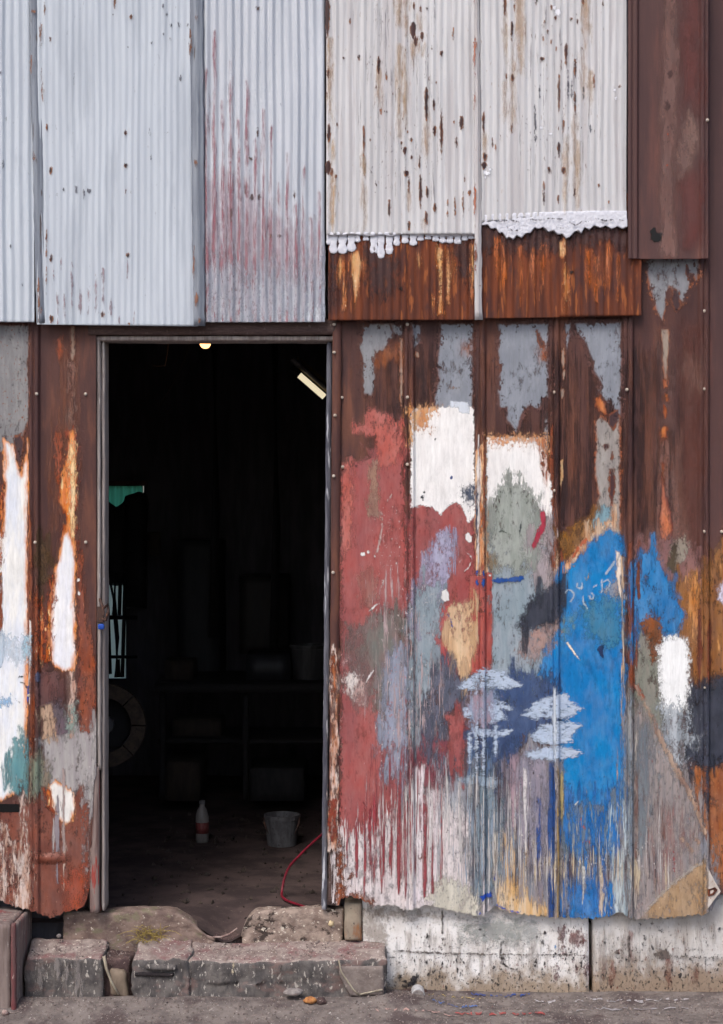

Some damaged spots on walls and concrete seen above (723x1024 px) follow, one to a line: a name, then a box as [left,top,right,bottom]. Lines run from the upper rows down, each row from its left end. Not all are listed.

corrosion [53,325,96,733]
corrosion [328,241,399,314]
peeling [356,320,480,410]
corrosion [415,215,628,317]
peeling [491,317,631,548]
corrosion [505,344,688,692]
peeling [642,259,704,441]
corrosion [28,506,47,770]
corrosion [0,785,91,919]
peeling [327,644,549,950]
peeling [604,801,632,917]
spalling [102,949,177,996]